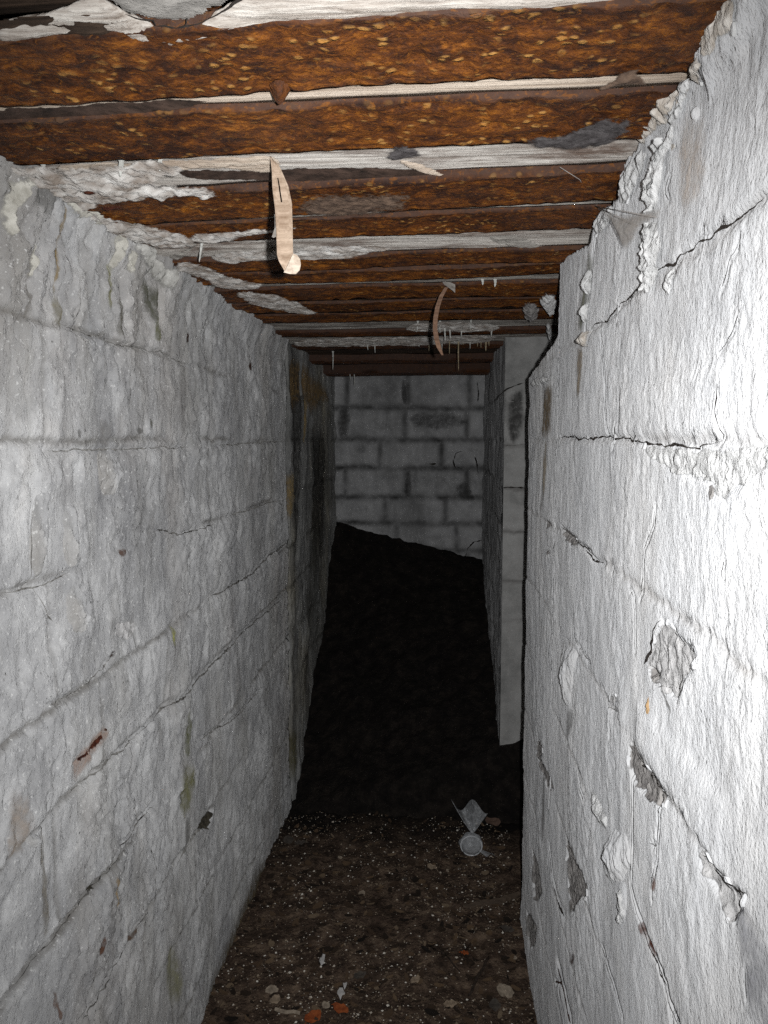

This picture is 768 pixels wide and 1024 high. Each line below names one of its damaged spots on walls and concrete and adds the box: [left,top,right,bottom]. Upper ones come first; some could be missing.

peeling [56,162,132,172]
peeling [157,156,280,172]
crack [658,198,764,287]
crack [588,238,638,375]
leakage [509,393,522,440]
crack [561,391,724,450]
crack [3,507,67,620]
crack [563,528,604,563]
spalling [644,619,701,712]
peeling [626,743,673,808]
spalling [565,841,588,912]
spalling [699,851,747,923]